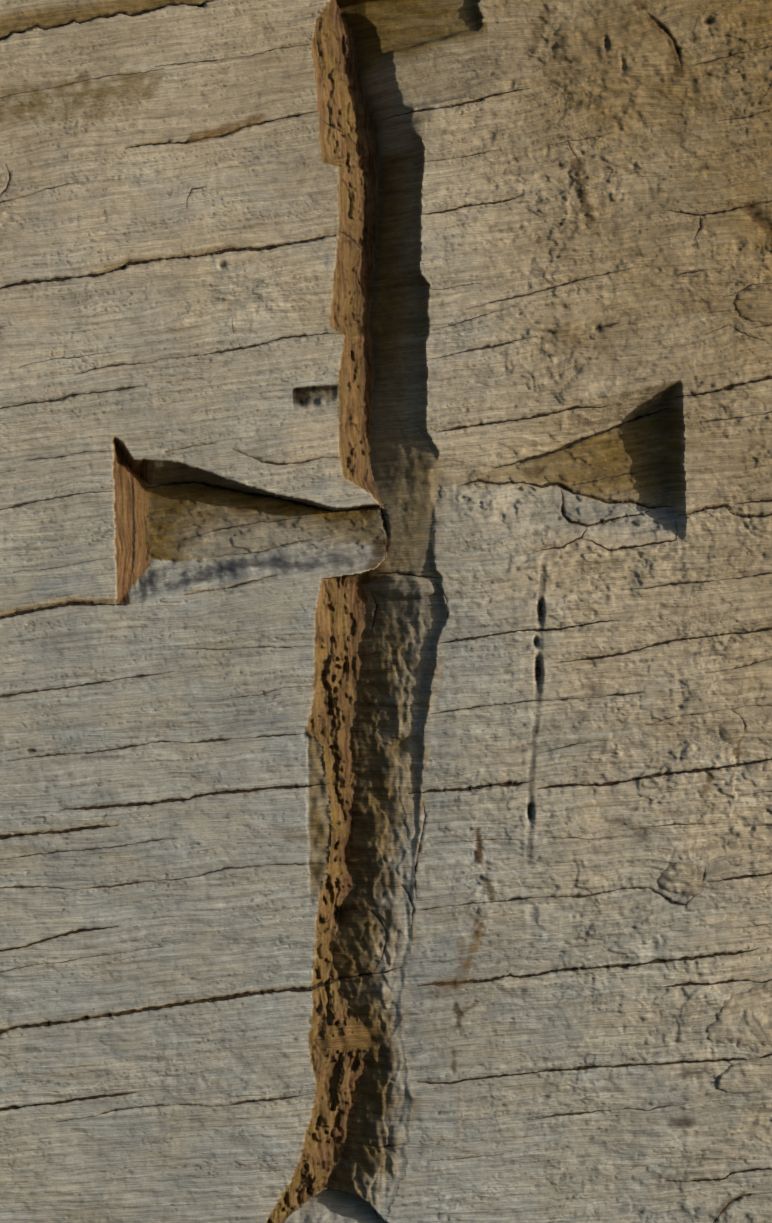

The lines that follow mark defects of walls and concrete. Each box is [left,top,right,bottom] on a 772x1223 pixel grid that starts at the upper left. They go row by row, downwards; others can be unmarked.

crack [418,195,521,216]
crack [0,231,370,289]
crack [666,200,772,277]
crack [432,267,633,359]
crack [167,443,340,465]
crack [439,376,772,551]
crack [0,477,619,645]
crack [623,572,772,590]
crack [559,627,772,673]
crack [431,692,642,714]
crack [0,704,772,1034]
crack [665,1168,772,1223]